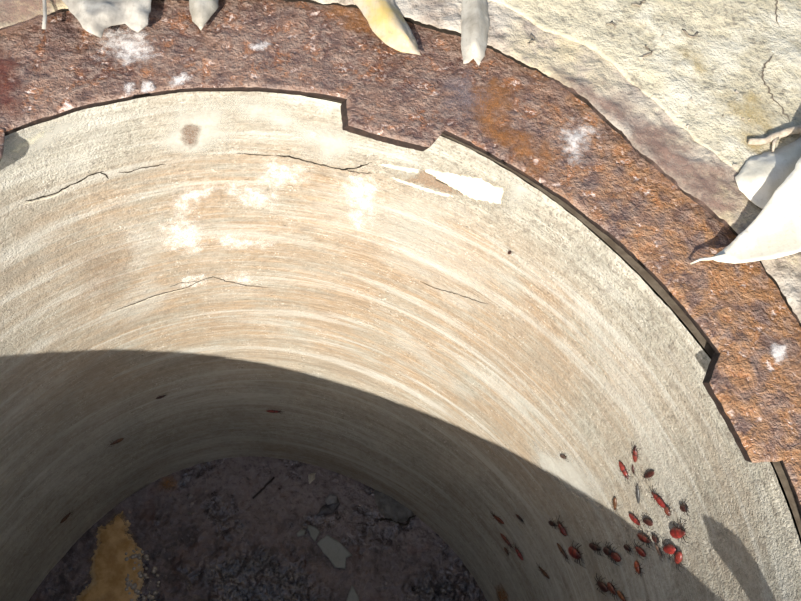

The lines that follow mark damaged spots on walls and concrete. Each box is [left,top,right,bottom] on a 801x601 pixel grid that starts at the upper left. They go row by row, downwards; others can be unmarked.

crack [23,164,165,205]
damp [229,163,301,207]
crack [238,153,372,174]
spalling [379,164,505,206]
rust [634,122,733,213]
damp [159,184,212,253]
crack [113,277,268,312]
rust [76,511,144,601]